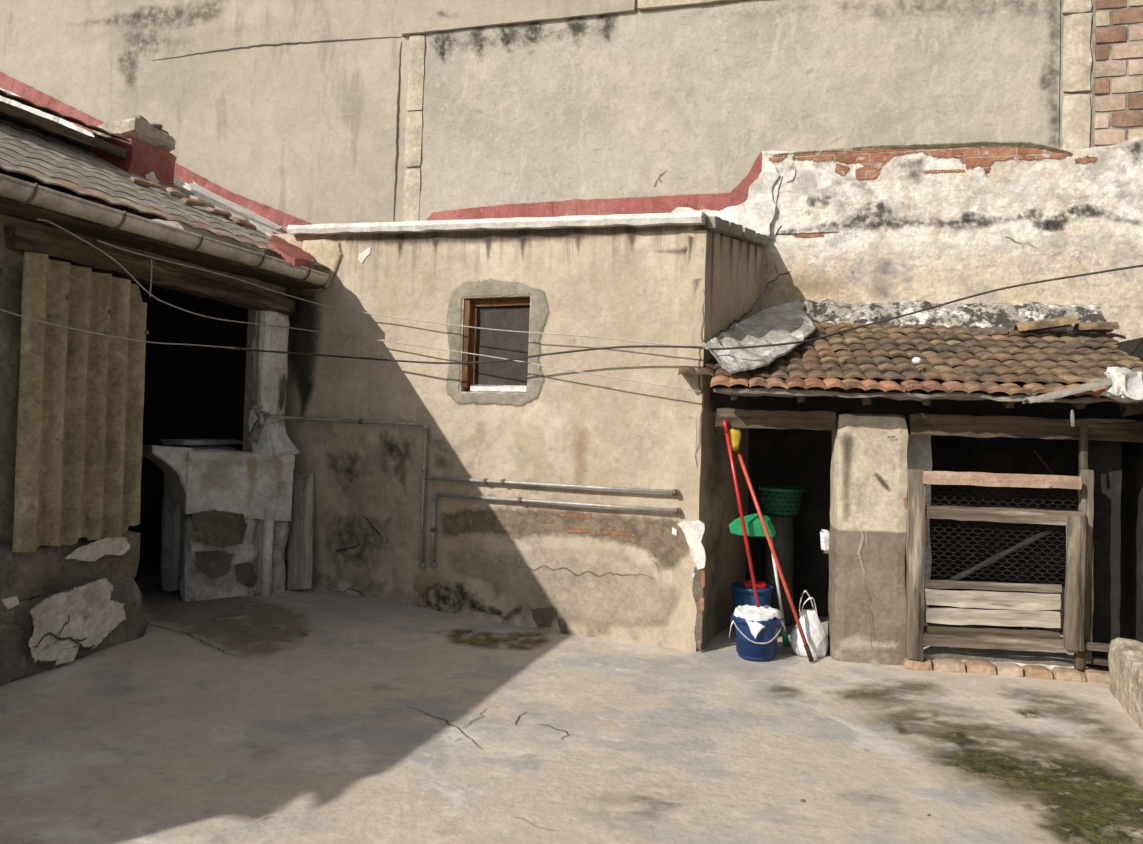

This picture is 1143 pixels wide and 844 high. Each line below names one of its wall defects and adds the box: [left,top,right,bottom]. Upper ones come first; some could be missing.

damp [501,21,541,52]
damp [567,17,584,35]
spalling [769,146,1097,240]
damp [832,203,923,228]
damp [940,213,995,227]
damp [1019,205,1104,244]
peeling [65,537,130,562]
spalling [441,508,706,652]
crack [499,559,659,578]
peeling [2,578,126,665]
crack [410,707,486,749]